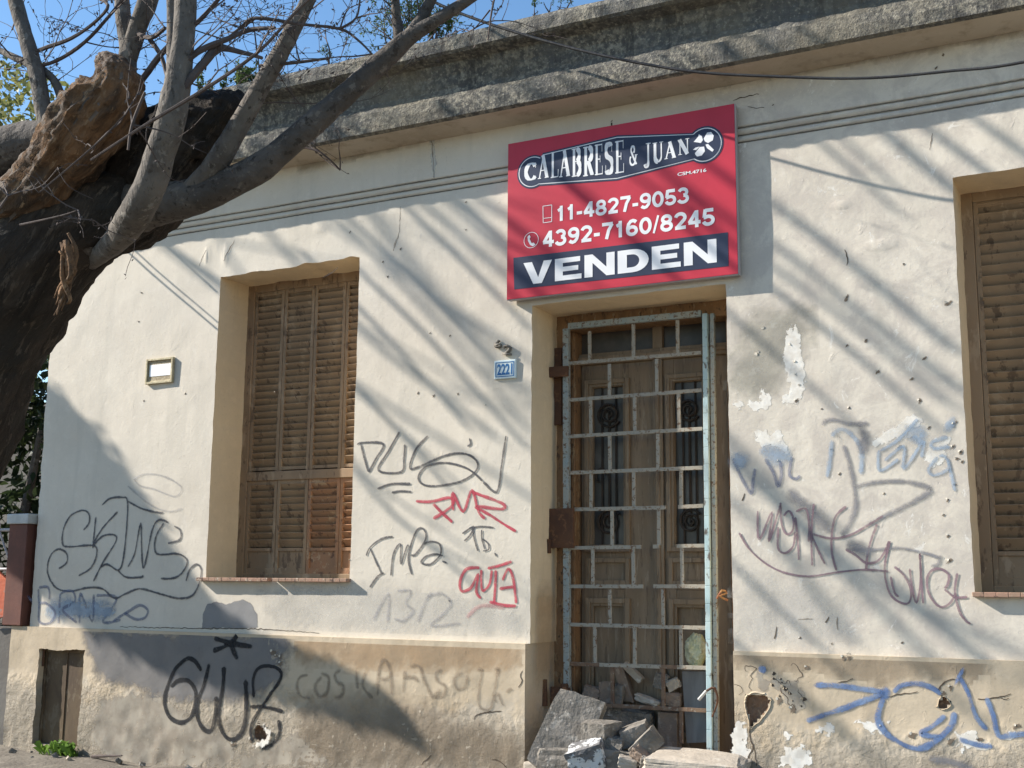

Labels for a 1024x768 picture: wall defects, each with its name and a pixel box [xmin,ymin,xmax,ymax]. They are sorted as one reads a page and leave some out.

peeling [732,324,807,411]
peeling [754,429,789,462]
spalling [936,685,952,710]
peeling [91,689,326,768]
spalling [730,671,807,759]
peeling [778,731,812,768]
peeling [815,722,835,737]
peeling [854,720,891,735]
peeling [947,730,991,754]